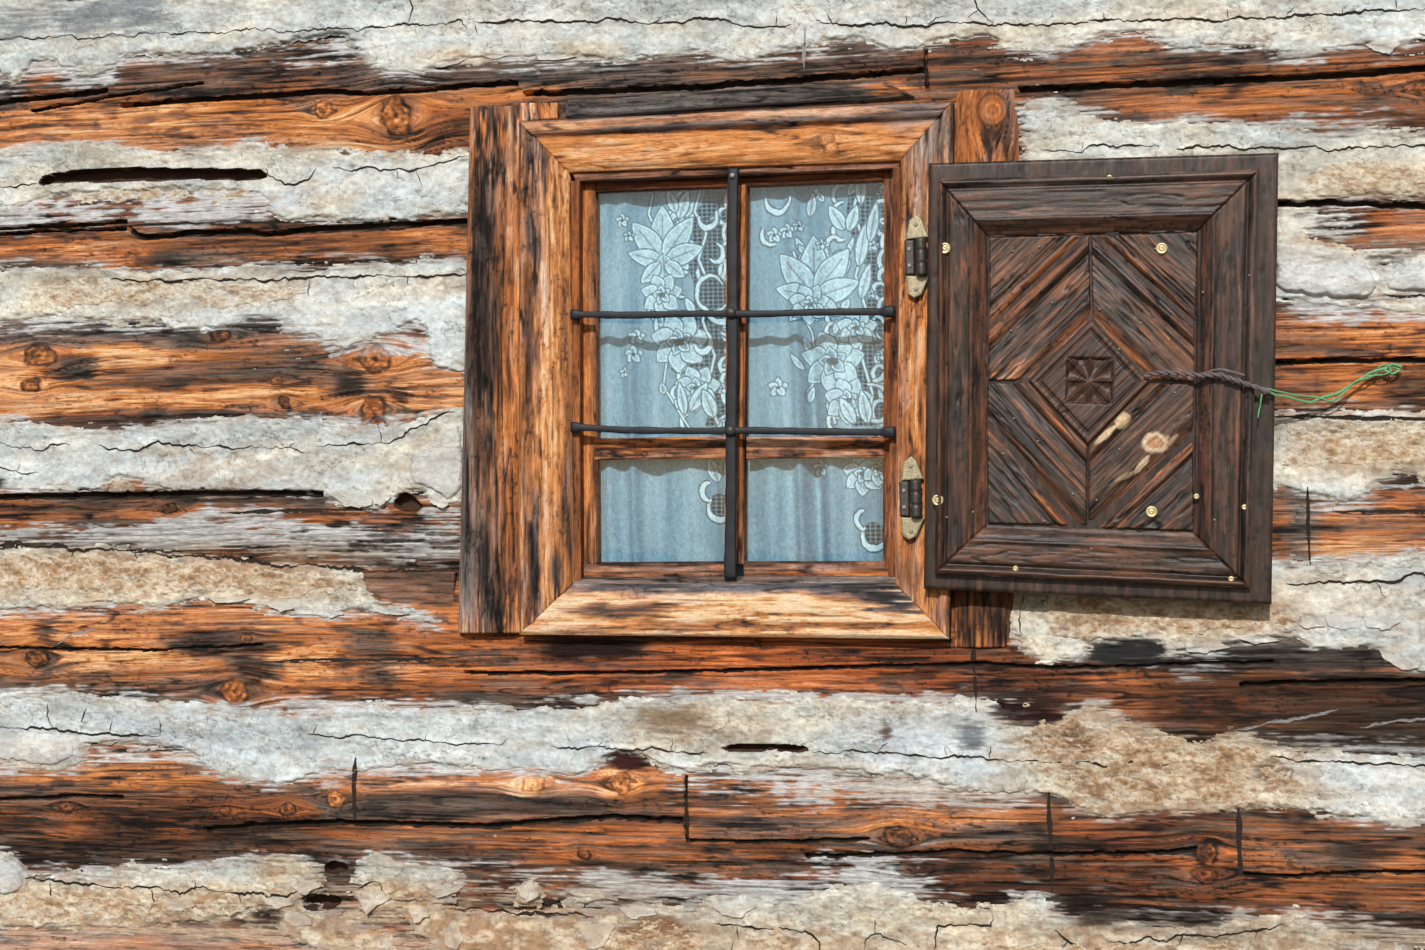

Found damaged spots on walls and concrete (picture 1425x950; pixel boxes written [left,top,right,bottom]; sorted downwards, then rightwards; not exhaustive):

crack [0,0,1424,40]
crack [0,64,926,112]
crack [266,156,464,186]
crack [0,218,468,240]
peeling [327,487,448,510]
flaking render [0,861,391,933]
peeling [408,883,465,923]
peeling [517,880,539,902]
peeling [443,920,464,950]
flaking render [966,938,1250,950]